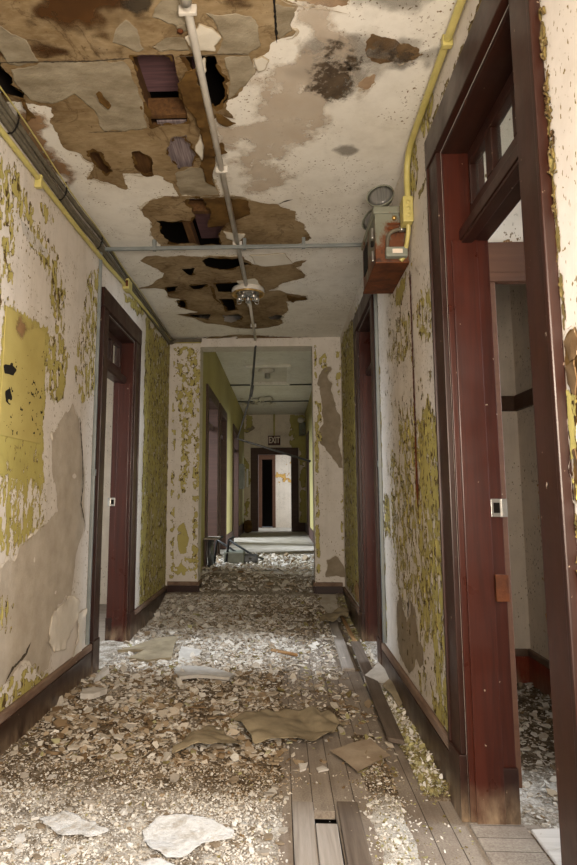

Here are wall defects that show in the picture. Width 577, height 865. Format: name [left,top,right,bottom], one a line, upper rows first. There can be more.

peeling [17,112,74,184]
damp [32,45,68,57]
damp [33,0,152,37]
damp [304,36,414,102]
flaking render [0,156,99,712]
peeling [124,294,201,605]
peeling [276,291,364,605]
peeling [377,259,448,732]